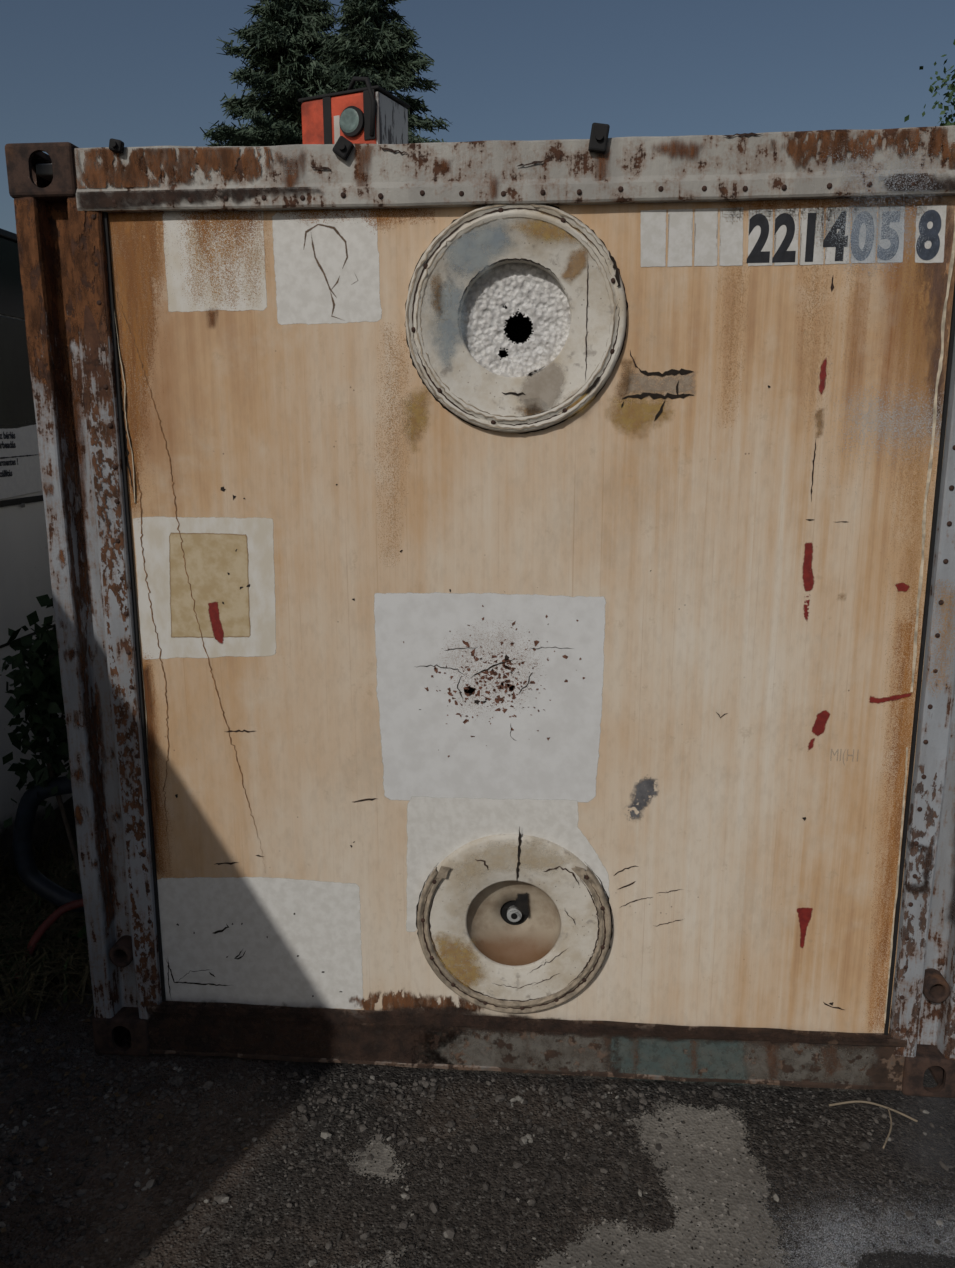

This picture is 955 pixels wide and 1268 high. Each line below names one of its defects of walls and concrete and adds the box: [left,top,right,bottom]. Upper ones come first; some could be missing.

corrosion [14,147,435,930]
crack [475,827,579,884]
corrosion [159,127,955,1044]